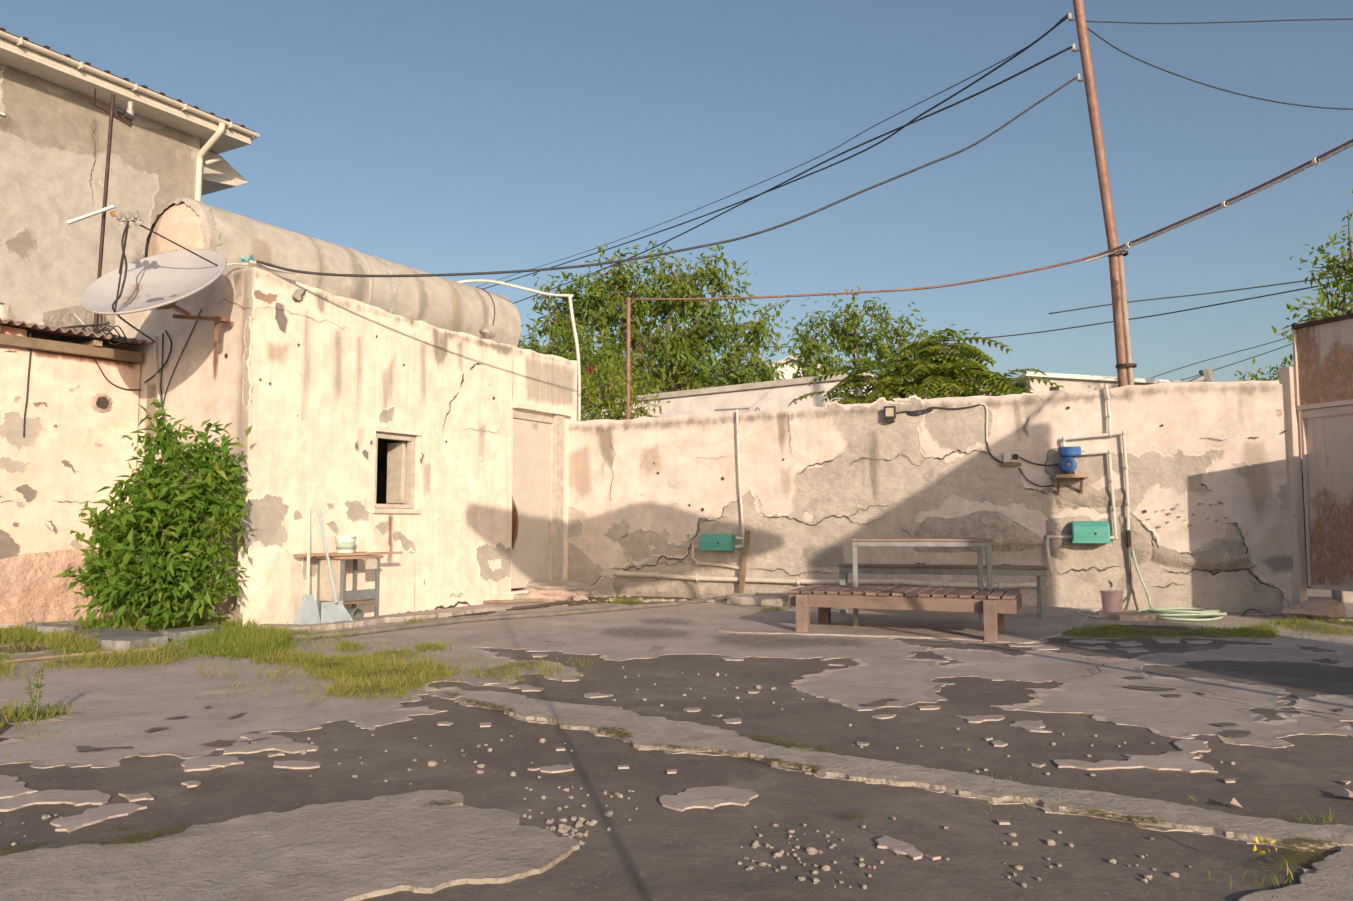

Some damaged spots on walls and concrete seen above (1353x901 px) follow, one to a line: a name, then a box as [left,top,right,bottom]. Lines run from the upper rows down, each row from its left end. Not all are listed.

crack [89,126,103,206]
peeling [0,65,195,233]
peeling [0,226,39,262]
corrosion [1296,327,1353,405]
peeling [0,394,59,559]
peeling [46,519,84,550]
peeling [59,459,80,475]
peeling [240,492,304,548]
peeling [301,556,318,582]
peeling [475,541,513,584]
peeling [568,392,1288,614]
corrosion [1311,493,1353,585]